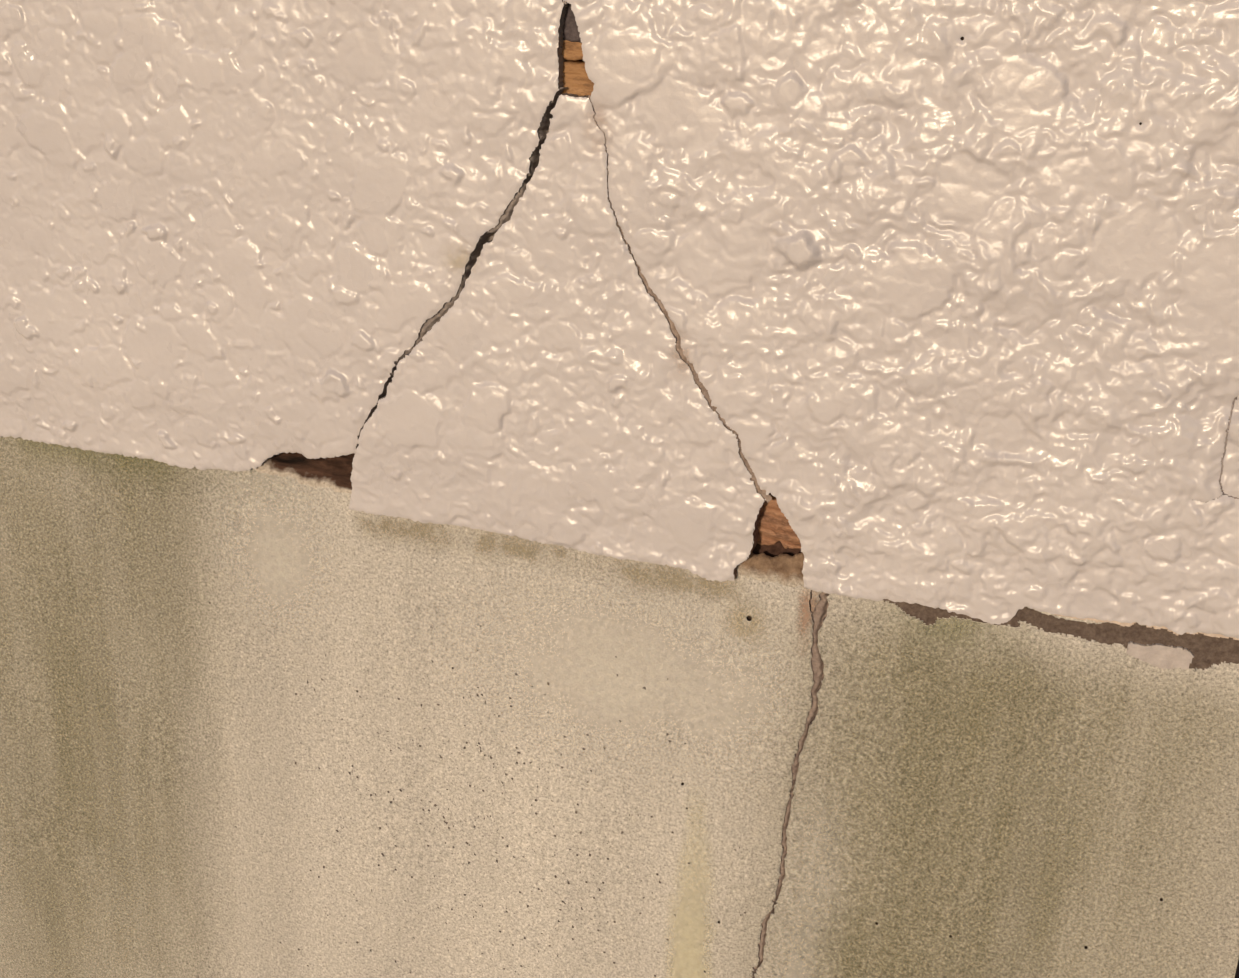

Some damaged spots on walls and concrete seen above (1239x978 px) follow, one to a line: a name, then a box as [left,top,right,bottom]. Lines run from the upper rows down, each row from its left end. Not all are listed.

spalling [557,2,594,98]
crack [354,87,772,503]
spalling [255,452,354,493]
spalling [733,493,806,589]
peeling [883,599,1239,670]
crack [752,590,829,978]
spalling [469,785,604,956]